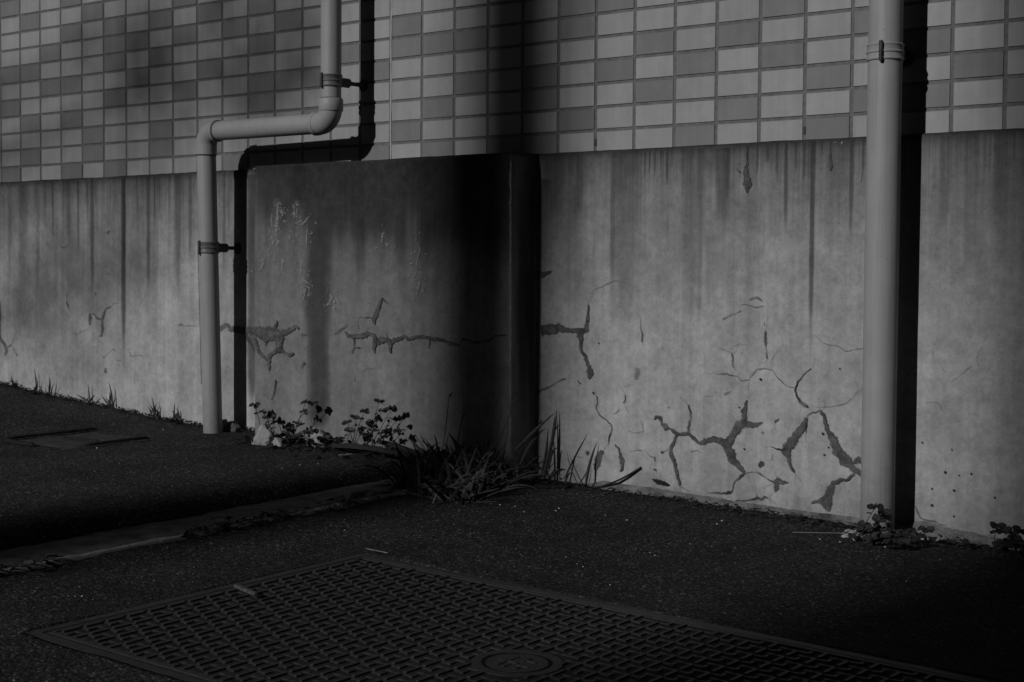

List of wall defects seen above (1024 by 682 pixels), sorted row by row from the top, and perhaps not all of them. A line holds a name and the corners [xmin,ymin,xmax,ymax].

crack [66,303,109,337]
water stain [266,155,536,423]
crack [334,298,507,353]
crack [538,282,626,444]
crack [638,322,861,511]